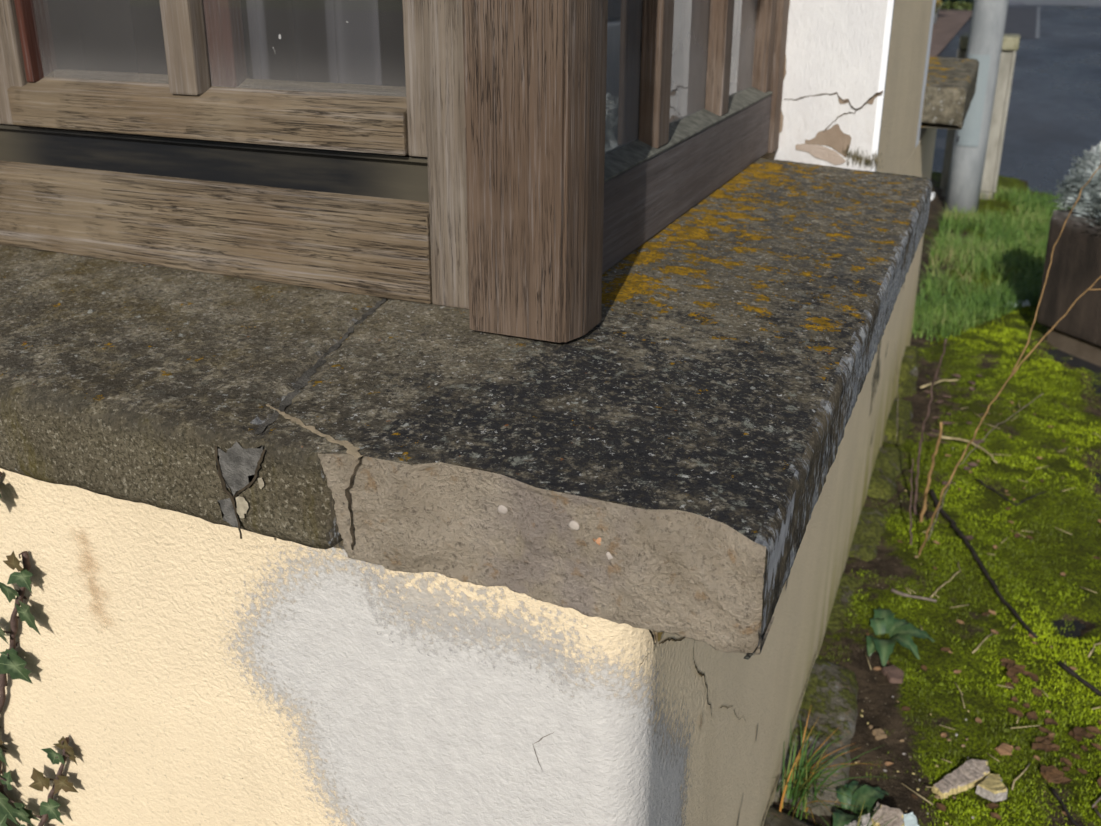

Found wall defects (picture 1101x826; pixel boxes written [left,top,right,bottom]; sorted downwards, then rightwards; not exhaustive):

flaking render [795,124,851,165]
crack [792,91,883,133]
crack [215,446,265,539]
spalling [236,496,249,518]
crack [266,404,364,550]
crack [638,629,746,722]